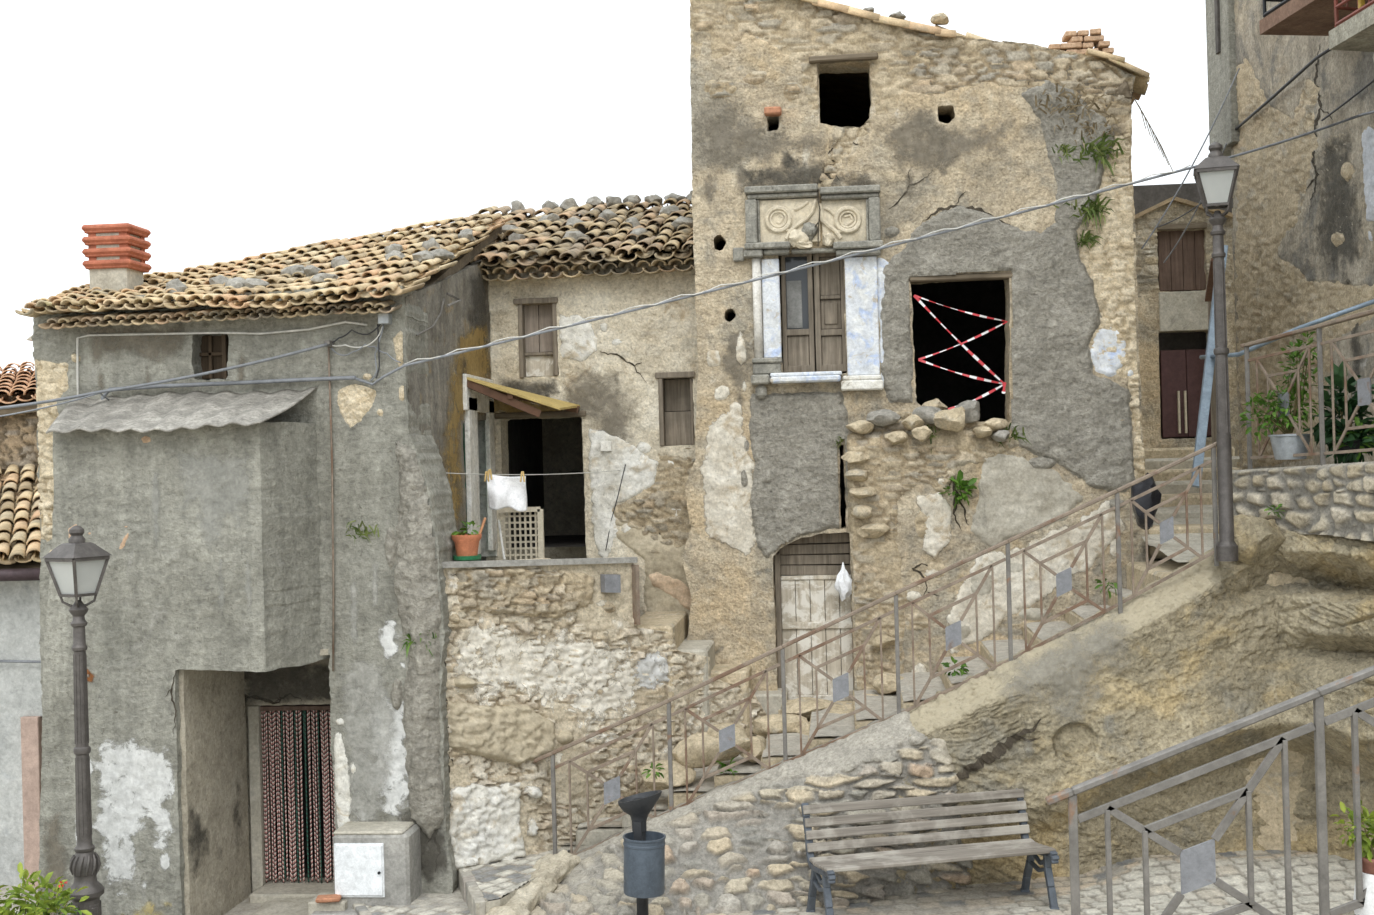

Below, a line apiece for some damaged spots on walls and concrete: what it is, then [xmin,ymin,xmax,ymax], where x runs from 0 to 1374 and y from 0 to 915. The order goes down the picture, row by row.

crack [1306,45,1333,207]
flaking render [691,0,1145,480]
flaking render [337,373,383,428]
crack [600,351,646,382]
peeling [588,331,756,558]
flaking render [846,398,1126,691]
peeling [379,620,405,668]
peeling [449,567,644,763]
peeling [90,738,175,896]